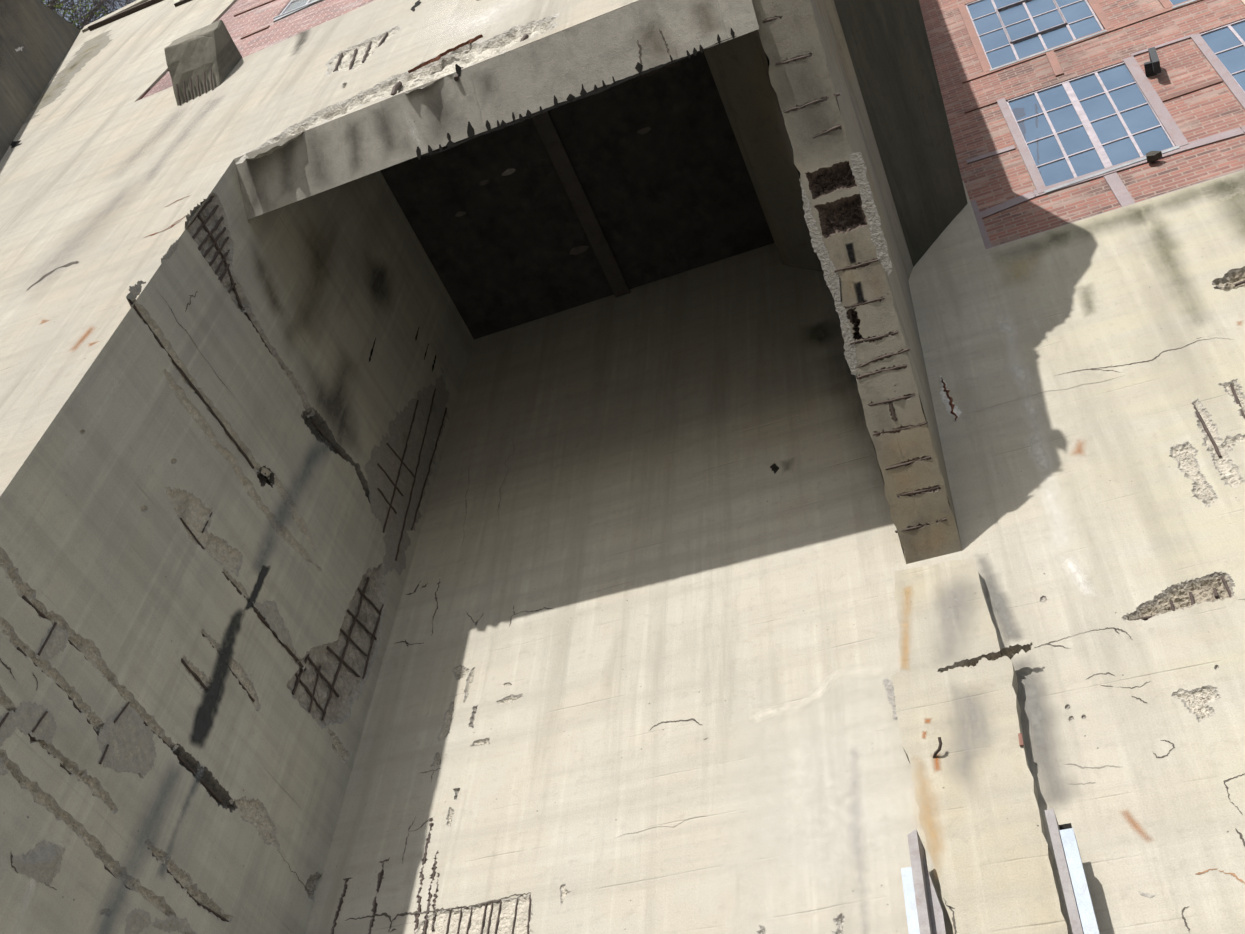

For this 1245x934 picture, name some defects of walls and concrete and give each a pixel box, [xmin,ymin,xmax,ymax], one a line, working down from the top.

spalling [799,152,910,380]
spalling [1212,266,1245,291]
crack [967,337,1234,413]
spalling [161,192,450,763]
spalling [1169,399,1245,507]
spalling [1122,571,1235,621]
spalling [0,547,280,934]
crack [649,718,707,740]
spalling [1171,685,1220,722]
crack [380,817,433,863]
crack [1196,773,1245,884]
crack [345,892,530,932]